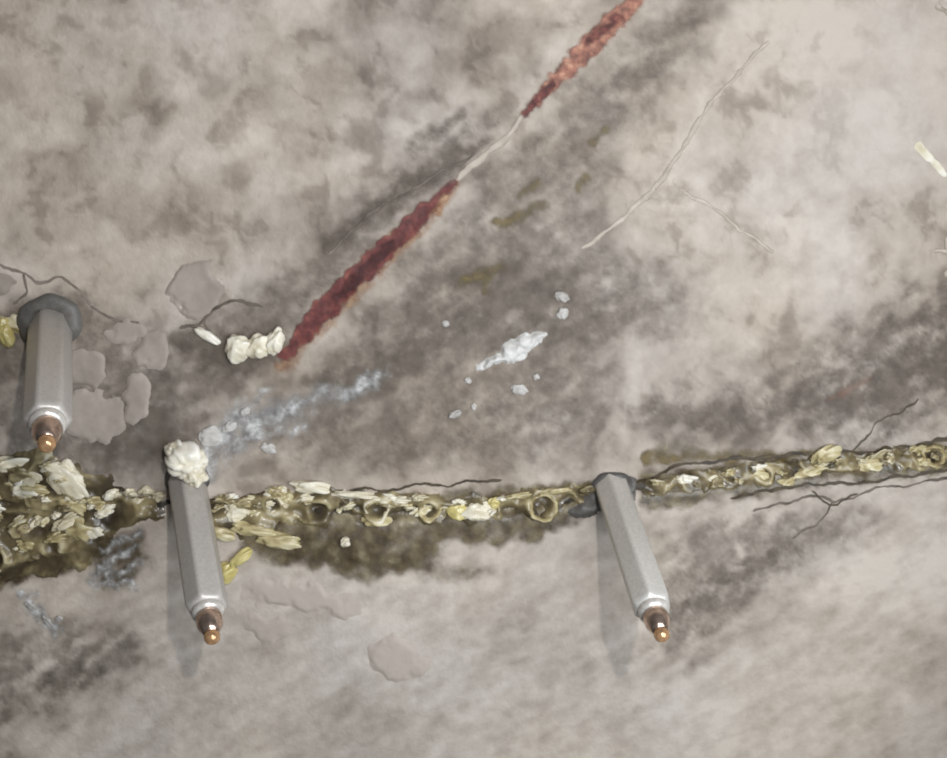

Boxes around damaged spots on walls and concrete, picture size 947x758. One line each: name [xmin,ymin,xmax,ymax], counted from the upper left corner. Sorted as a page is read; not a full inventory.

rust [522,0,643,117]
crack [0,264,139,324]
crack [179,299,263,334]
rust [276,180,458,370]
leakage [406,138,674,452]
leakage [642,304,947,437]
crack [157,500,171,508]
crack [314,479,502,514]
crack [636,399,947,539]
leakage [640,443,947,509]
leakage [88,531,143,587]
leakage [0,569,69,647]